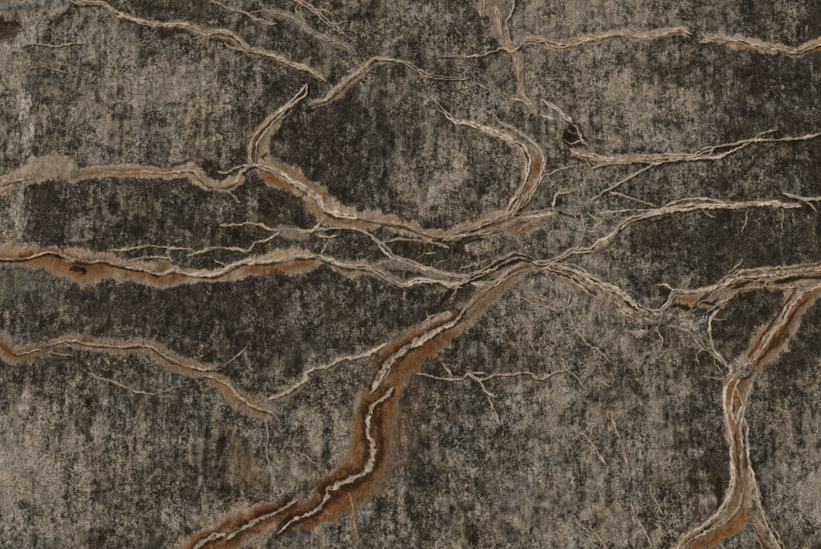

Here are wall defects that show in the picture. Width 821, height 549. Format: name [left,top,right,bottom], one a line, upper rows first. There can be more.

crack [0,0,693,122]
crack [699,32,821,58]
crack [0,84,821,305]
crack [0,331,278,480]
crack [174,197,821,549]